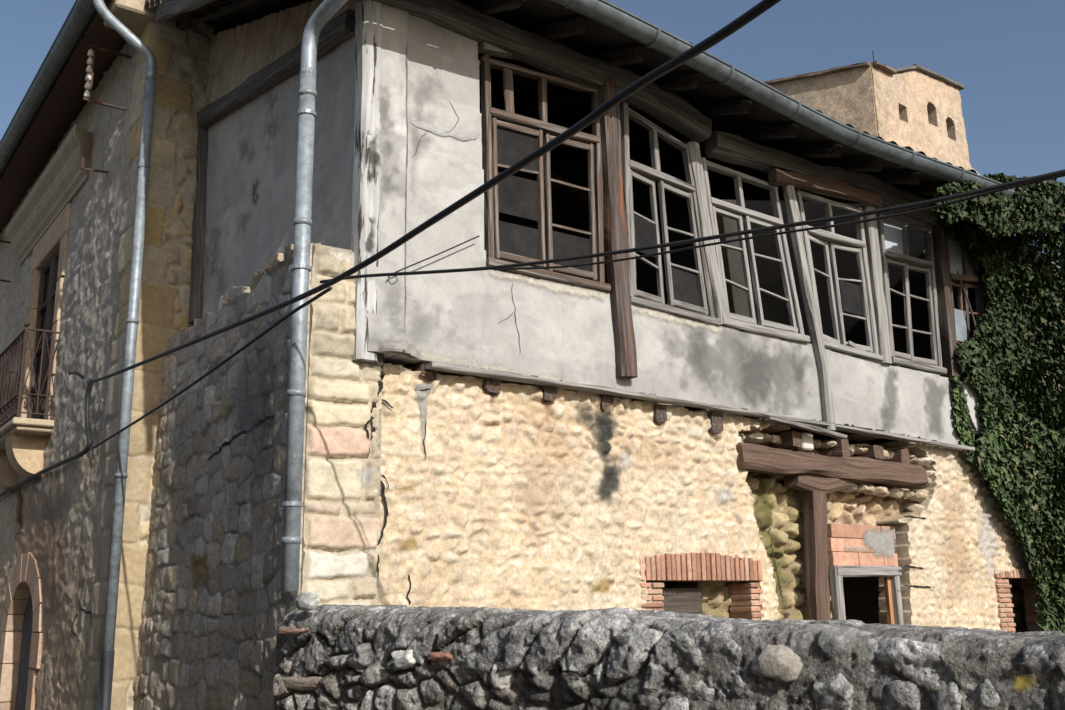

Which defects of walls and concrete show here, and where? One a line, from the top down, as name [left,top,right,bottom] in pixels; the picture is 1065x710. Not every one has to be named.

crack [386,41,479,314]
crack [497,282,521,353]
crack [364,362,393,587]
water stain [581,409,629,499]
crack [71,546,92,642]